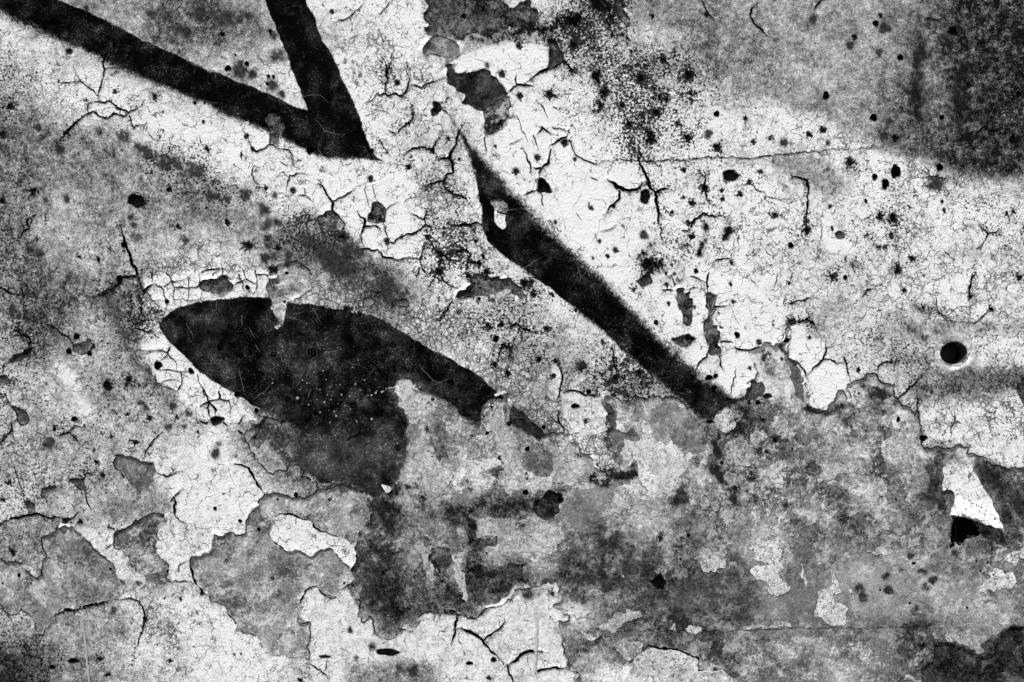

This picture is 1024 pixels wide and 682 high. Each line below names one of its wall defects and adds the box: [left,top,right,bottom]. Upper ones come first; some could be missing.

crack [58,32,155,144]
peeling [418,0,538,148]
crack [240,1,883,316]
peeling [111,440,155,496]
peeling [190,318,1024,682]
peeling [0,514,171,634]
crack [451,617,567,682]